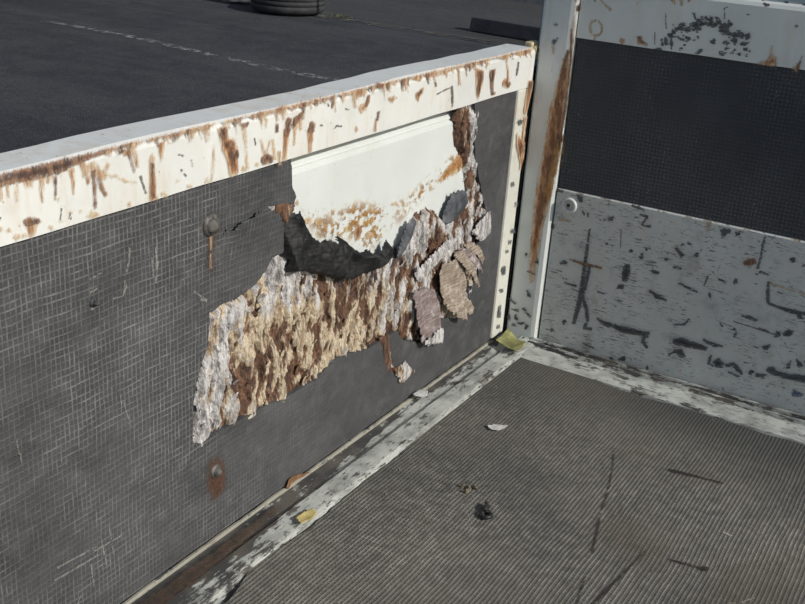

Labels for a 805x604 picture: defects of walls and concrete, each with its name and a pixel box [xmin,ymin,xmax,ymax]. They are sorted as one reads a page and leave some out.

peeling [656,12,750,57]
corrosion [0,48,533,217]
corrosion [529,0,580,283]
corrosion [0,217,40,240]
corrosion [305,206,388,244]
peeling [193,105,491,447]
peeling [617,264,630,290]
peeling [596,318,650,349]
peeling [759,327,794,350]
peeling [668,338,805,397]